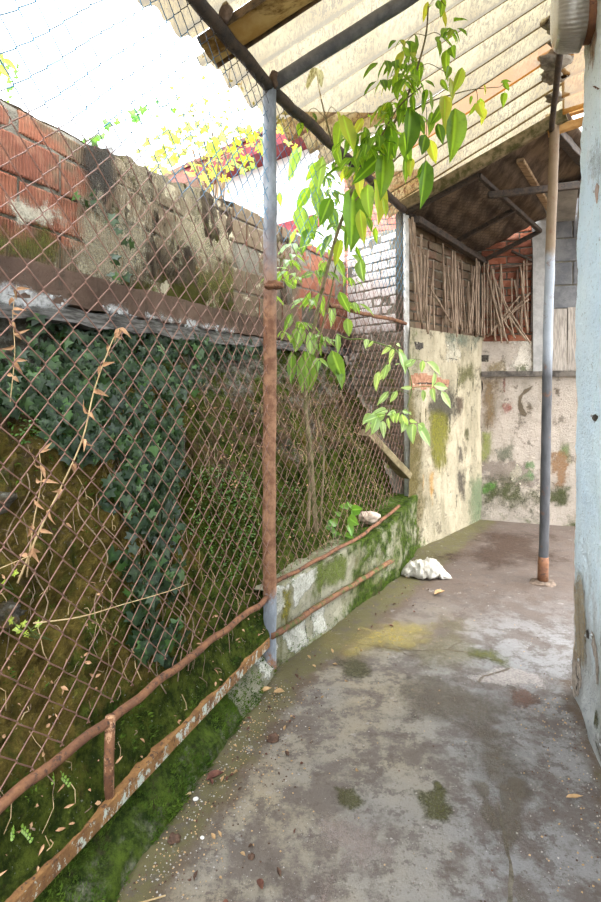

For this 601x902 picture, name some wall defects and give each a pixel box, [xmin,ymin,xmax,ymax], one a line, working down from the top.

water stain [420,379,463,425]
water stain [472,361,505,428]
water stain [518,386,533,417]
spalling [482,458,539,493]
water stain [482,475,569,512]
spalling [551,451,569,487]